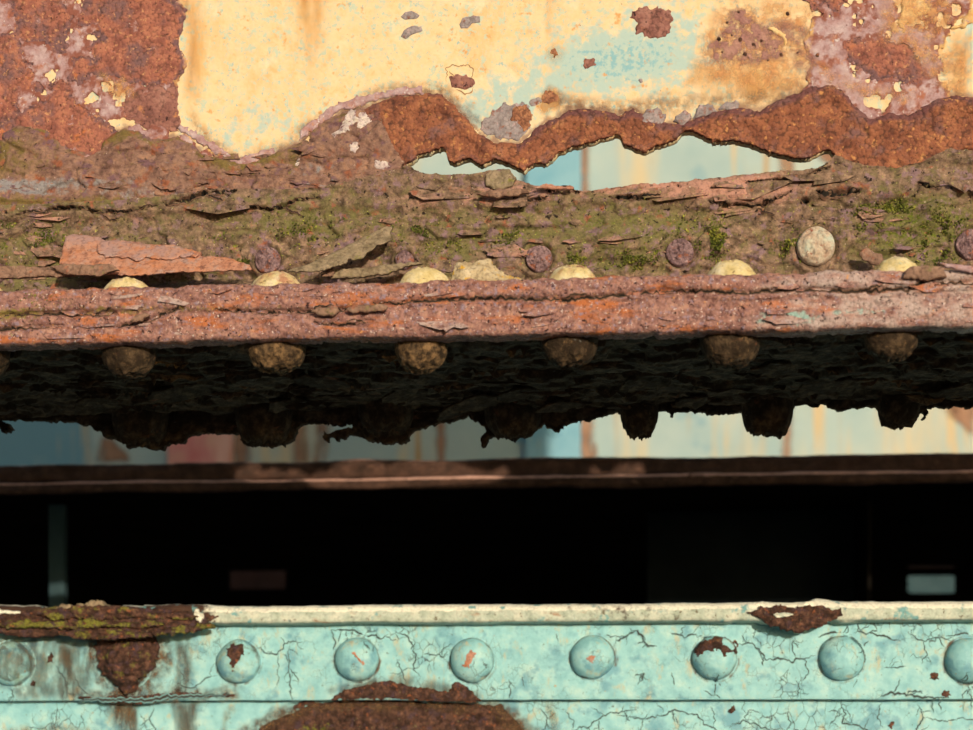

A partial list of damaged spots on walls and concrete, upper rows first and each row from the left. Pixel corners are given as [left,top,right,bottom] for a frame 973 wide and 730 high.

rust [0,0,973,205]
peeling [480,97,542,141]
peeling [642,100,739,125]
rust [951,406,973,432]
rust [748,604,843,634]
crack [7,664,235,730]
crack [259,637,302,702]
rust [245,680,531,730]
crack [331,629,453,683]
crack [496,676,525,699]
rust [694,636,739,658]
crack [540,623,973,730]